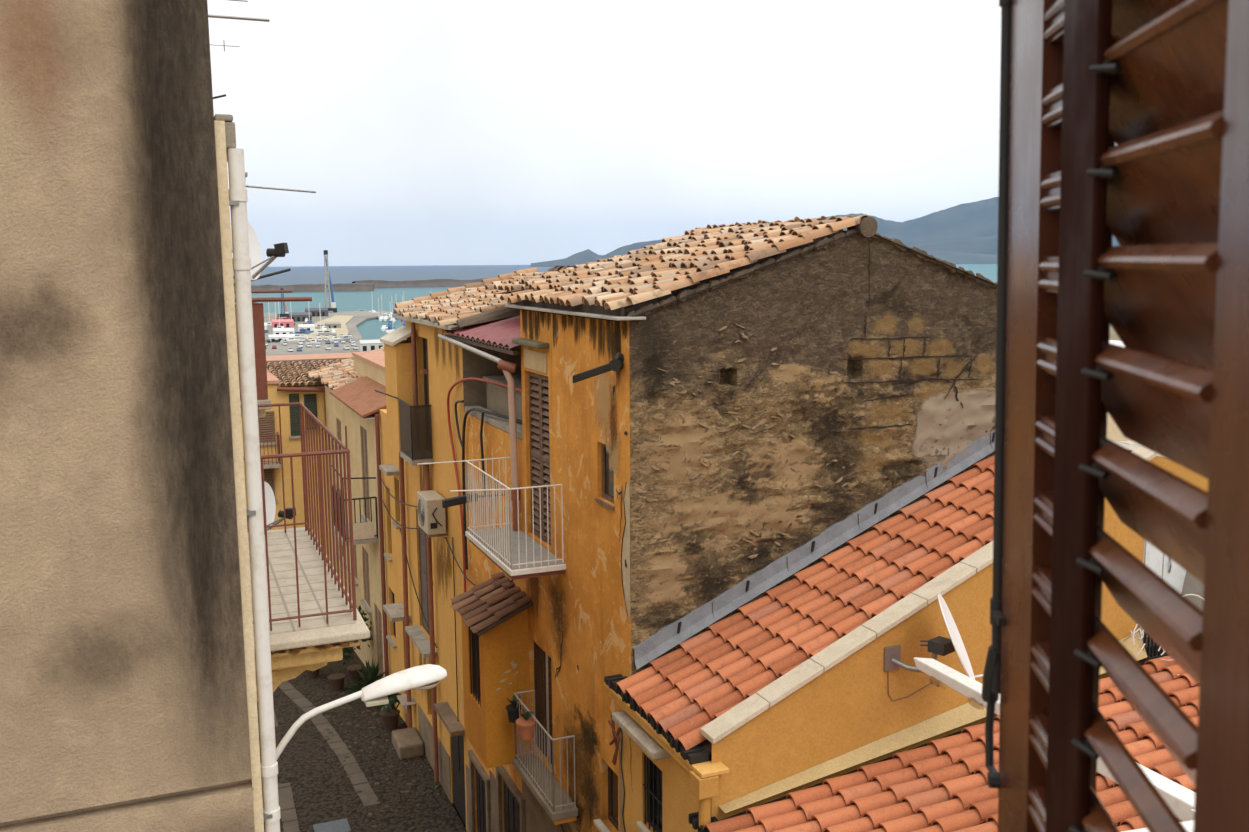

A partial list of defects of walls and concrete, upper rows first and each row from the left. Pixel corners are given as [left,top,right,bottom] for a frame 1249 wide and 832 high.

water stain [131,0,245,671]
water stain [522,310,668,396]
flaking render [770,314,995,470]
flaking render [593,368,849,619]
water stain [528,577,566,633]
water stain [564,711,606,832]